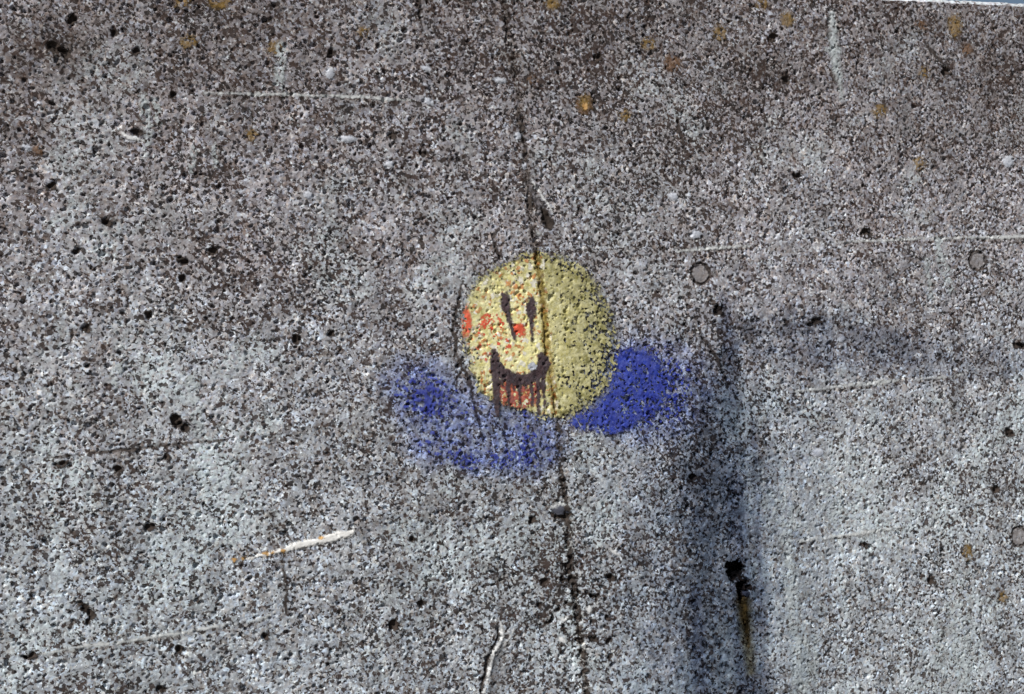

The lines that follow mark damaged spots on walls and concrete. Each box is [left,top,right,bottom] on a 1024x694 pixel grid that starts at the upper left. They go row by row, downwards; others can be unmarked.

crack [503,0,537,254]
crack [554,415,591,694]
corrosion [725,559,753,647]